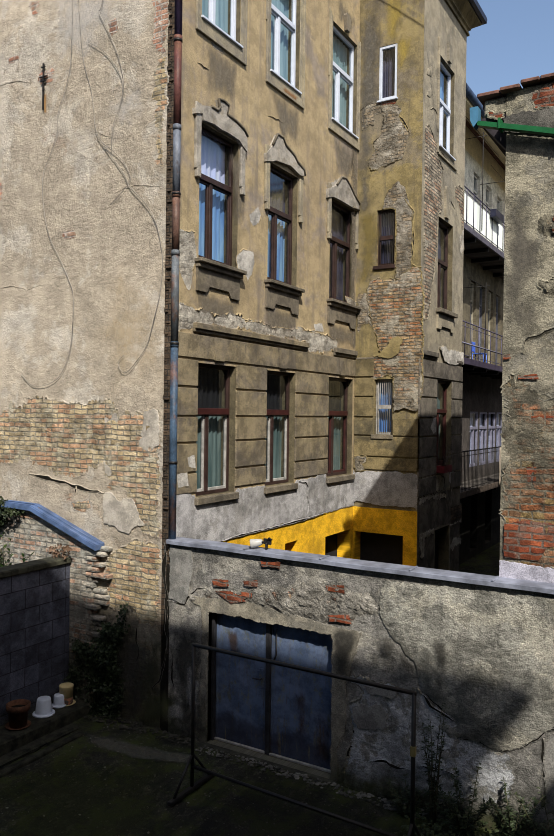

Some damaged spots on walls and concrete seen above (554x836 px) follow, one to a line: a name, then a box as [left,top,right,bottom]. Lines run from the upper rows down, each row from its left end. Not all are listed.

flaking render [531,81,554,110]
peeling [179,228,197,291]
peeling [236,248,255,282]
flaking render [345,124,443,413]
peeling [178,301,338,355]
peeling [439,345,464,366]
crack [514,326,554,401]
crack [29,473,104,495]
crack [146,542,206,695]
flaking render [0,394,517,807]
crack [369,759,459,778]
crack [422,692,554,815]